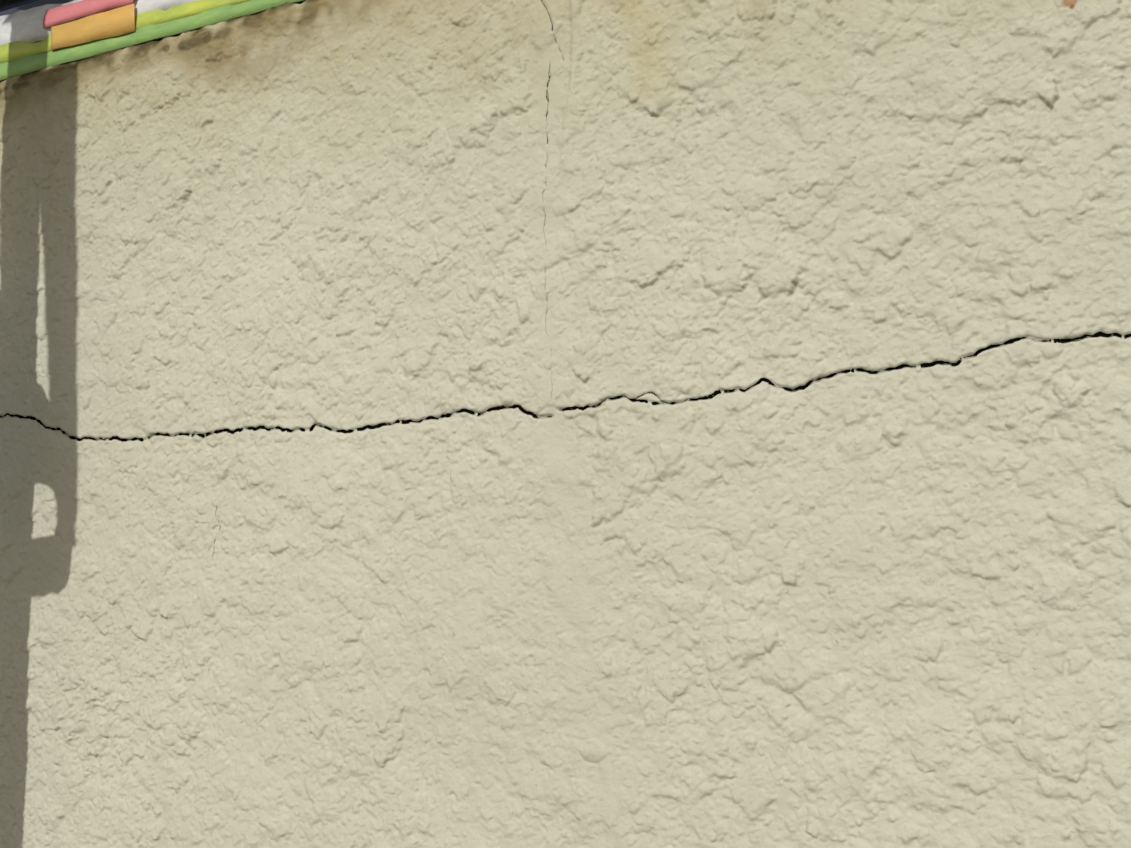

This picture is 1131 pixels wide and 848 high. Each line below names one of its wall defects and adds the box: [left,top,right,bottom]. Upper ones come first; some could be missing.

crack [0,279,1131,442]